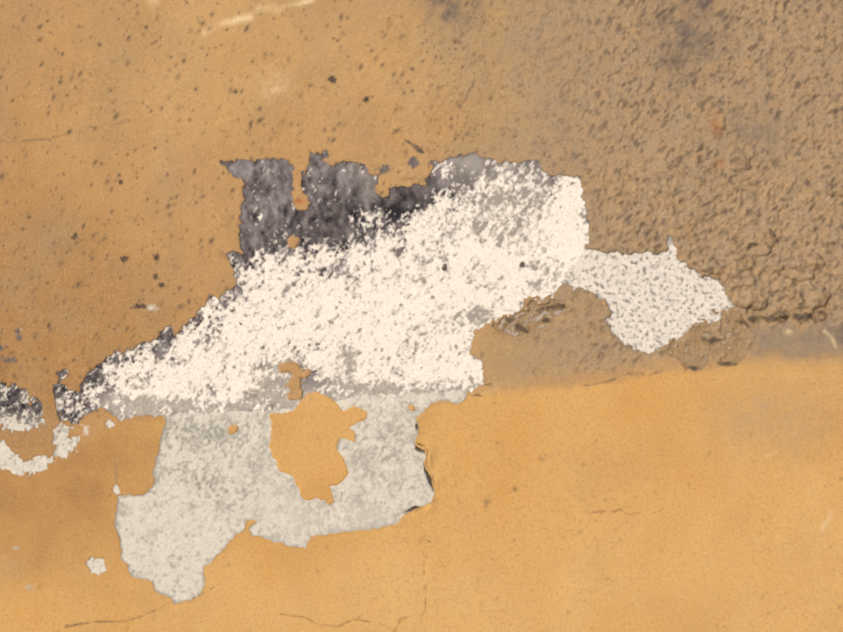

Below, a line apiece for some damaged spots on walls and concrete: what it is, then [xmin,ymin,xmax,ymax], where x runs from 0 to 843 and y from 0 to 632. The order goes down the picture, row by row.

peeling [0,150,827,604]
crack [56,584,219,632]
crack [279,550,427,632]